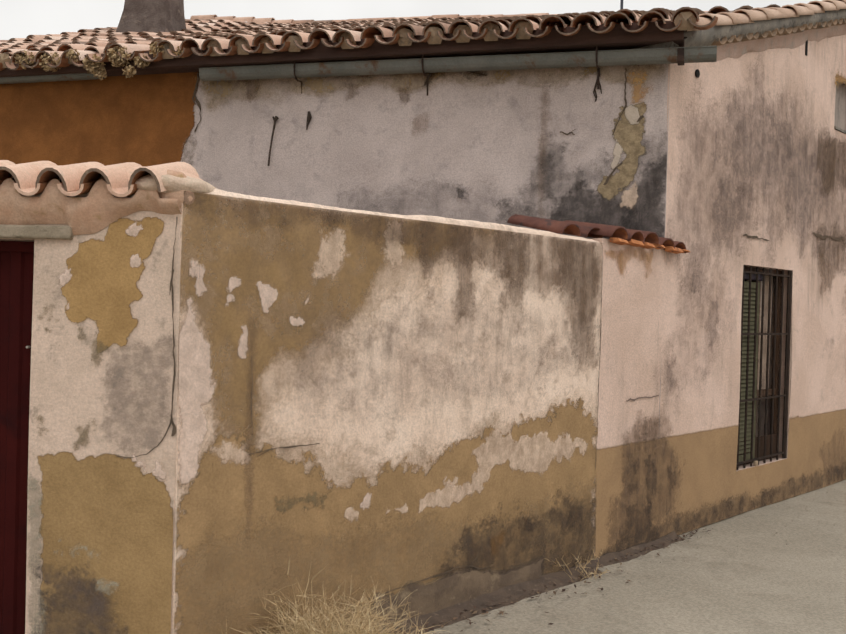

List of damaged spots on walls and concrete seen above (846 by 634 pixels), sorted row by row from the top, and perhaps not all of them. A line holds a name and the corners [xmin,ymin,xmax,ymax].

leakage [551,159,666,236]
spalling [597,69,647,208]
peeling [59,217,164,362]
crack [116,217,177,458]
leakage [180,191,599,441]
peeling [37,298,598,634]
leakage [372,487,597,588]
leakage [604,417,846,555]